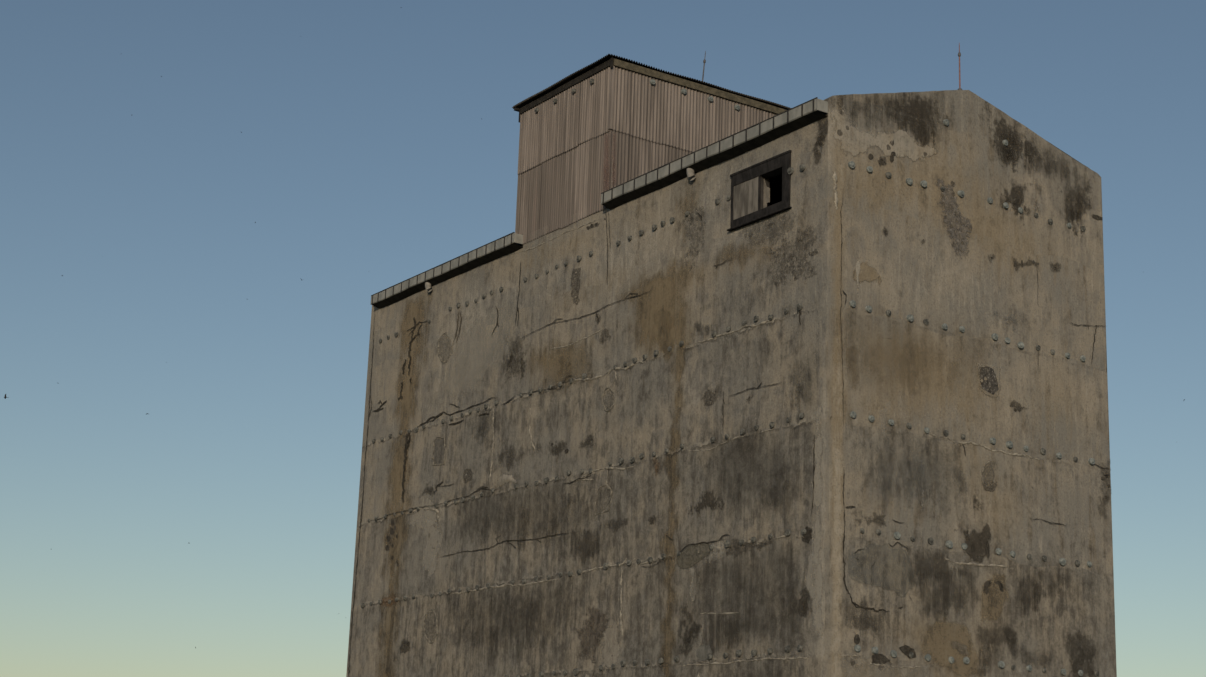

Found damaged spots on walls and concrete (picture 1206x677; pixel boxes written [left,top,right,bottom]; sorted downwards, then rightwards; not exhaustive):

damp [814,118,828,164]
damp [831,91,954,147]
damp [985,104,1091,222]
spalling [937,179,972,256]
crack [492,210,650,339]
spalling [977,364,1001,397]
crack [348,313,582,677]
crack [809,435,817,513]
crack [643,534,729,567]
crack [842,474,912,612]
damp [907,524,1042,677]